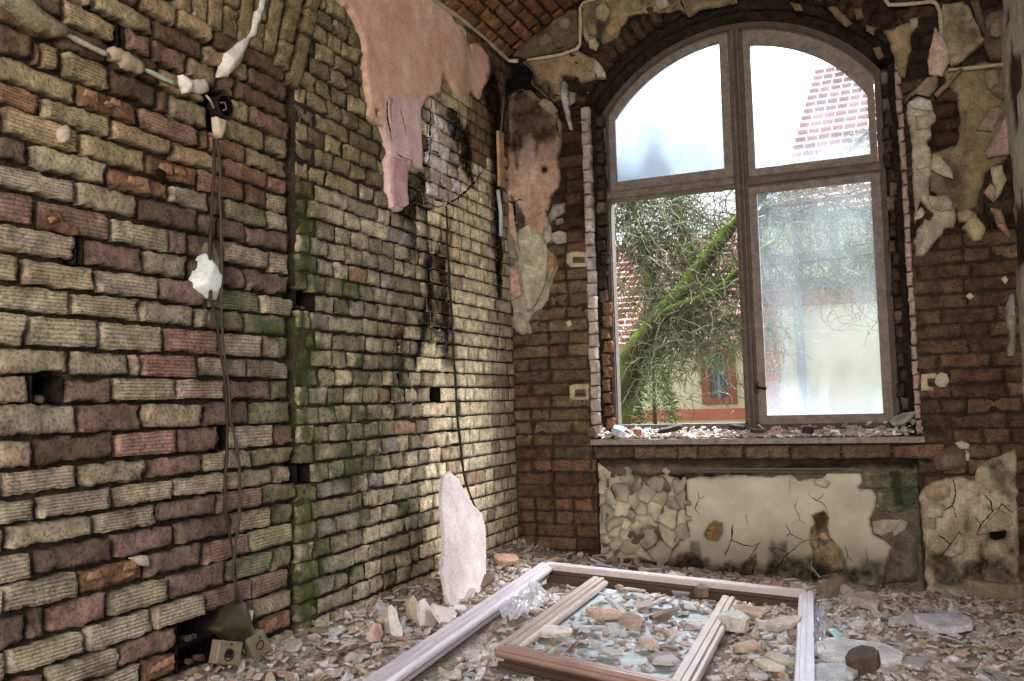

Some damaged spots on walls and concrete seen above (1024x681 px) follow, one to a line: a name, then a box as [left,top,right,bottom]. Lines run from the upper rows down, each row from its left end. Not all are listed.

flaking render [334,0,493,212]
water stain [444,108,474,187]
flaking render [507,0,737,335]
flaking render [904,0,1011,257]
peeling [598,463,611,479]
crack [725,480,828,575]
peeling [669,467,908,587]
crack [938,480,1014,554]